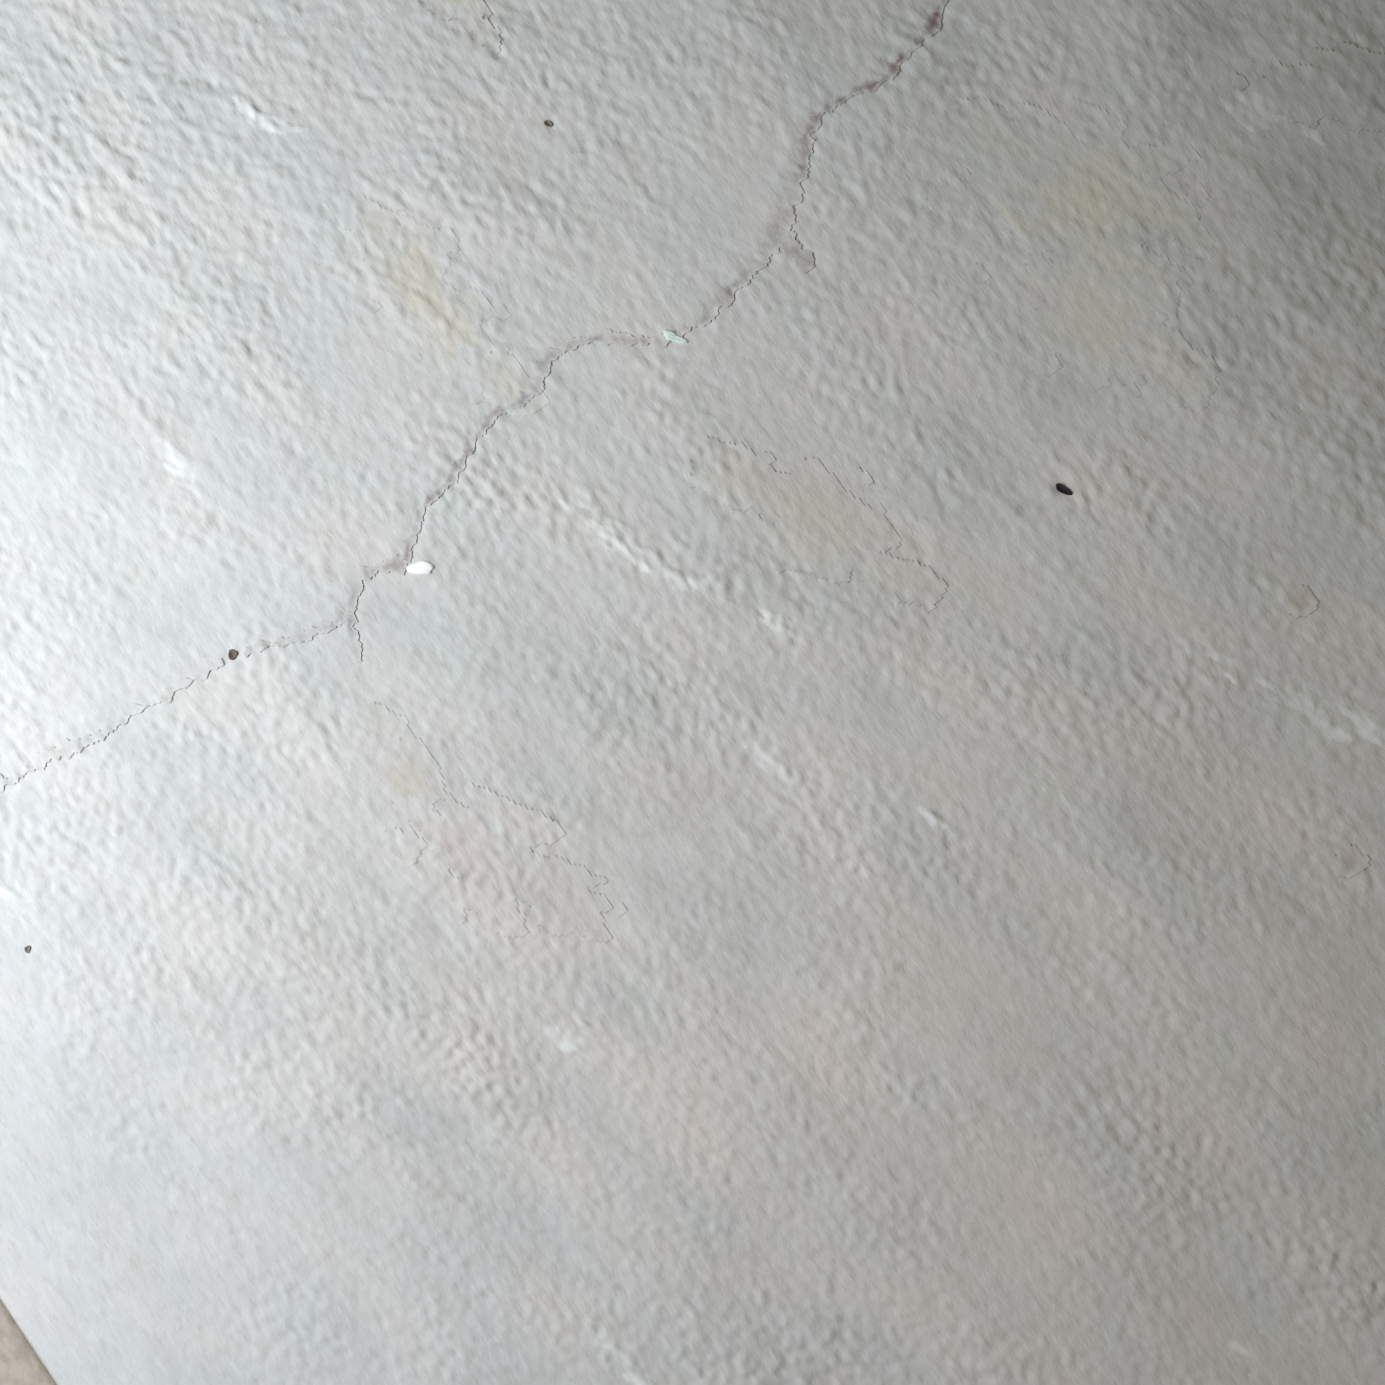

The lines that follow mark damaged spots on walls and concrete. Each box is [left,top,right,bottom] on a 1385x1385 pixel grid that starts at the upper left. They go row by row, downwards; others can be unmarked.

crack [0,0,948,792]